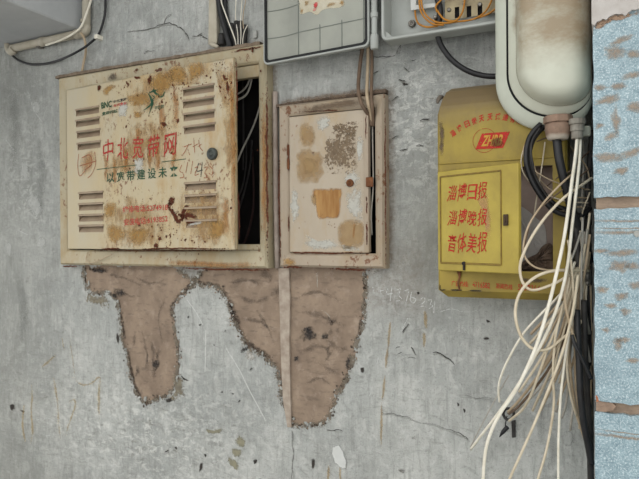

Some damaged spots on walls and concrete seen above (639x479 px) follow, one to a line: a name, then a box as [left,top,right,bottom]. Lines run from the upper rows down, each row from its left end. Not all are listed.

crack [127,14,207,40]
spalling [596,12,637,29]
spalling [81,265,284,408]
spalling [290,267,380,430]
crack [383,413,468,440]